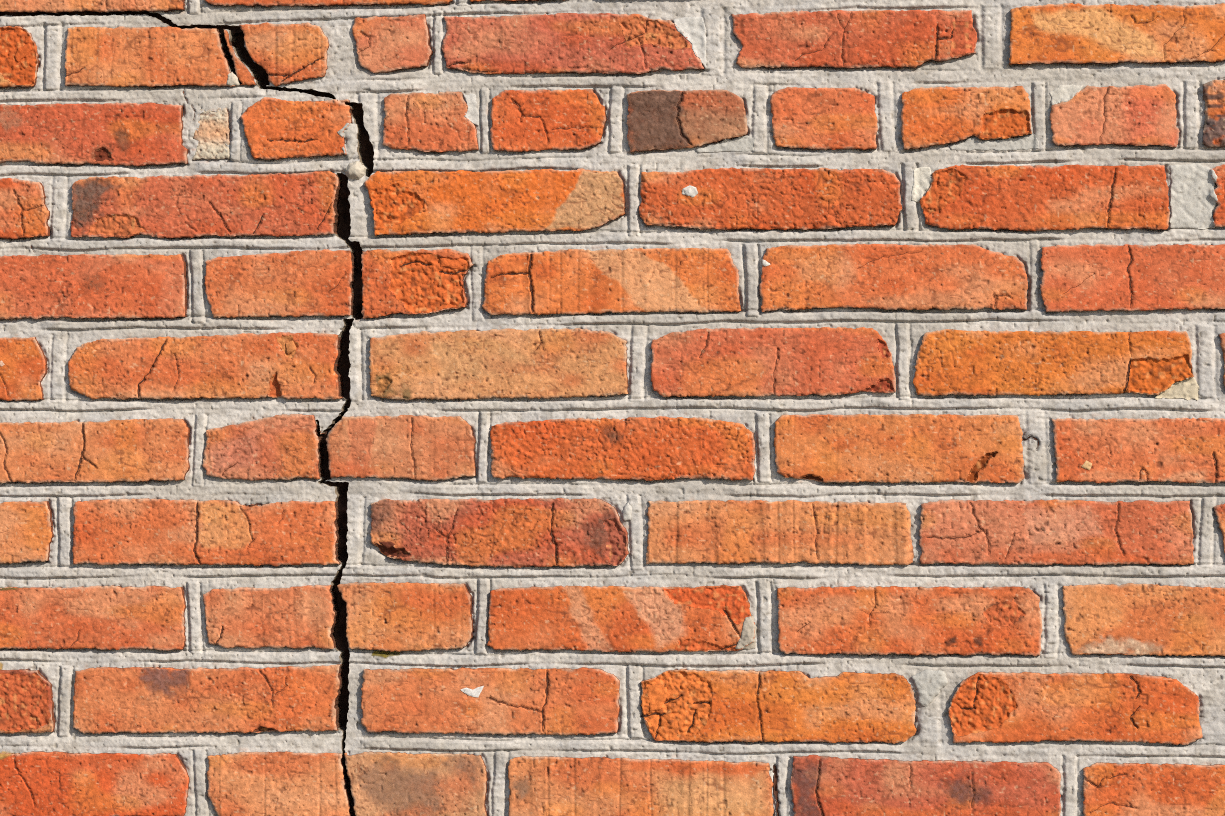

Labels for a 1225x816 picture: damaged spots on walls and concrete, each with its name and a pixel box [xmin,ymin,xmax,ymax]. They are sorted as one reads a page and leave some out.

crack [0,3,374,728]
crack [345,759,356,816]